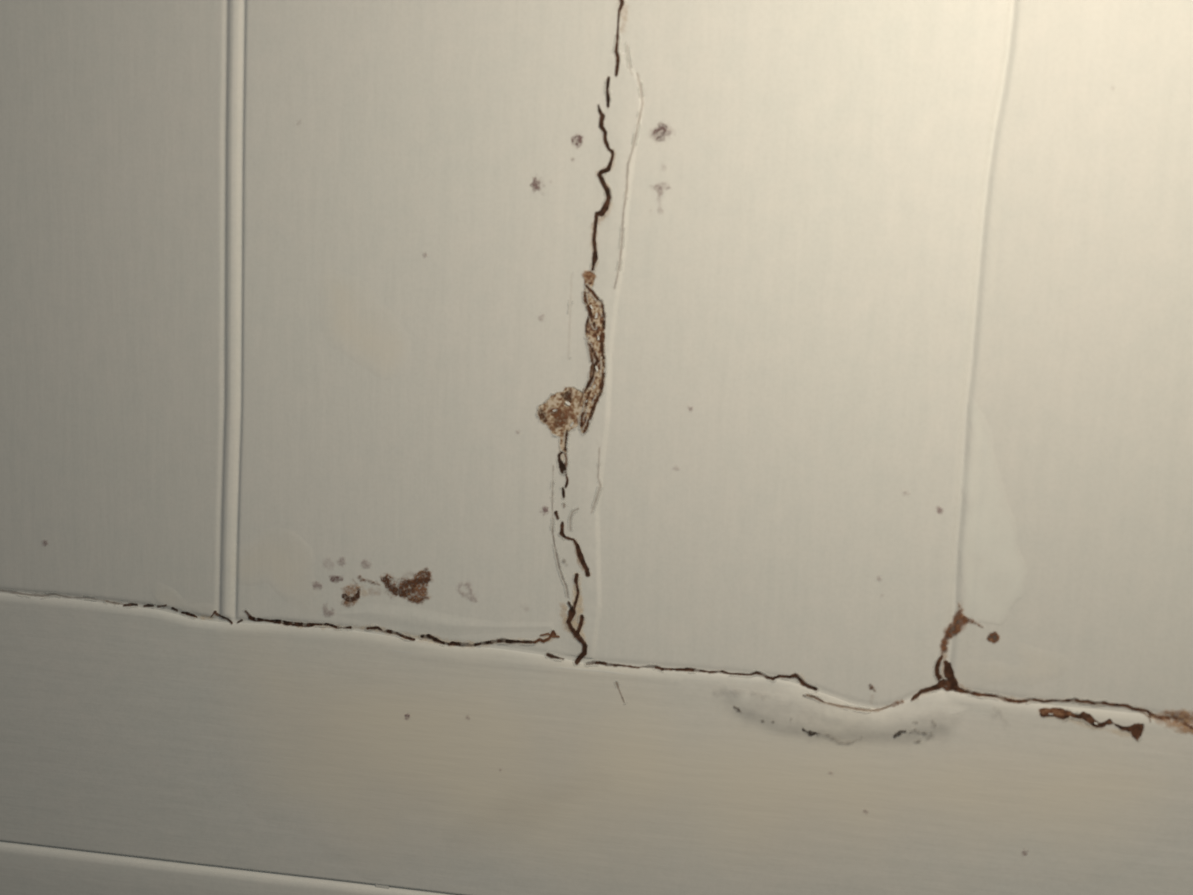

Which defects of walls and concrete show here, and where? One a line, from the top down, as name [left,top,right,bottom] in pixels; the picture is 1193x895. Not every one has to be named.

crack [591,0,624,271]
rust [342,569,430,604]
crack [123,430,890,711]
rust [895,610,999,704]
crack [963,689,1170,719]
rust [1152,711,1193,733]